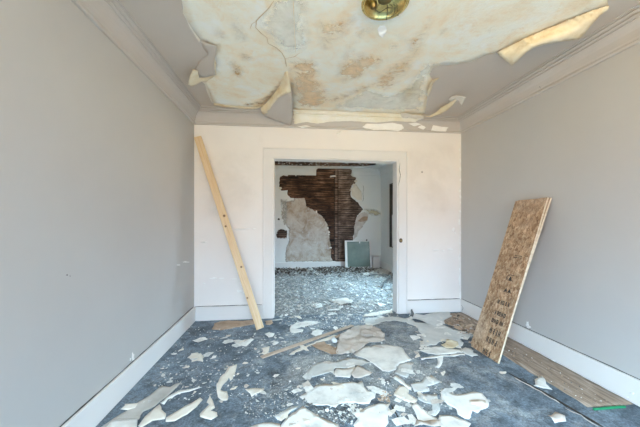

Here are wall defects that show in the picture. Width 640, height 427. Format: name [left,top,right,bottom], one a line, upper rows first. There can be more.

crack [250,1,298,67]
peeling [182,0,609,132]
flaking render [275,161,376,262]